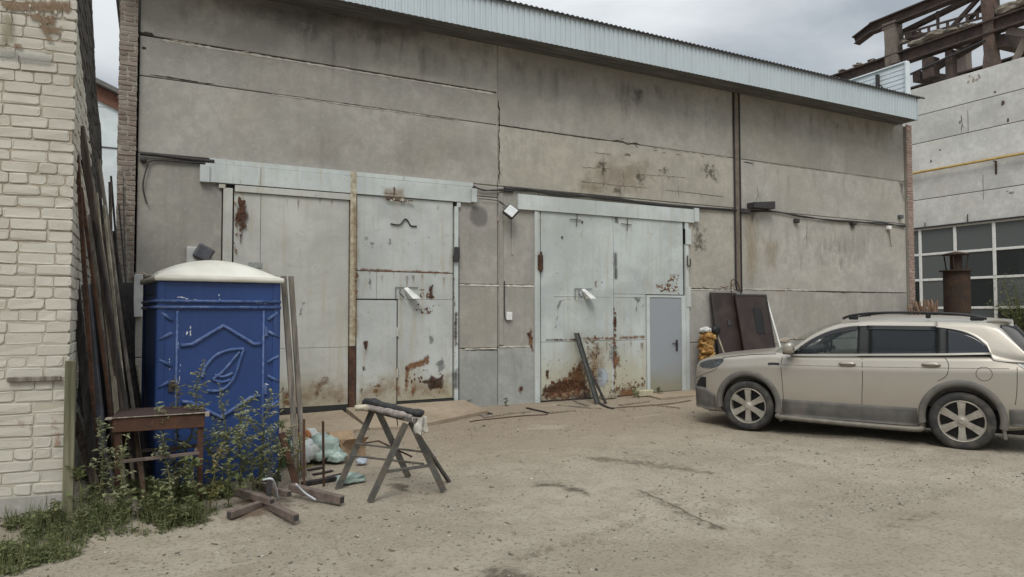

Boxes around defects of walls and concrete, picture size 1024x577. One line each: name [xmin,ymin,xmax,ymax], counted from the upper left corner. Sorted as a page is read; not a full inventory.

crack [498,100,723,197]
rust [232,191,248,254]
rust [355,262,455,314]
rust [396,356,456,395]
rust [542,308,645,401]